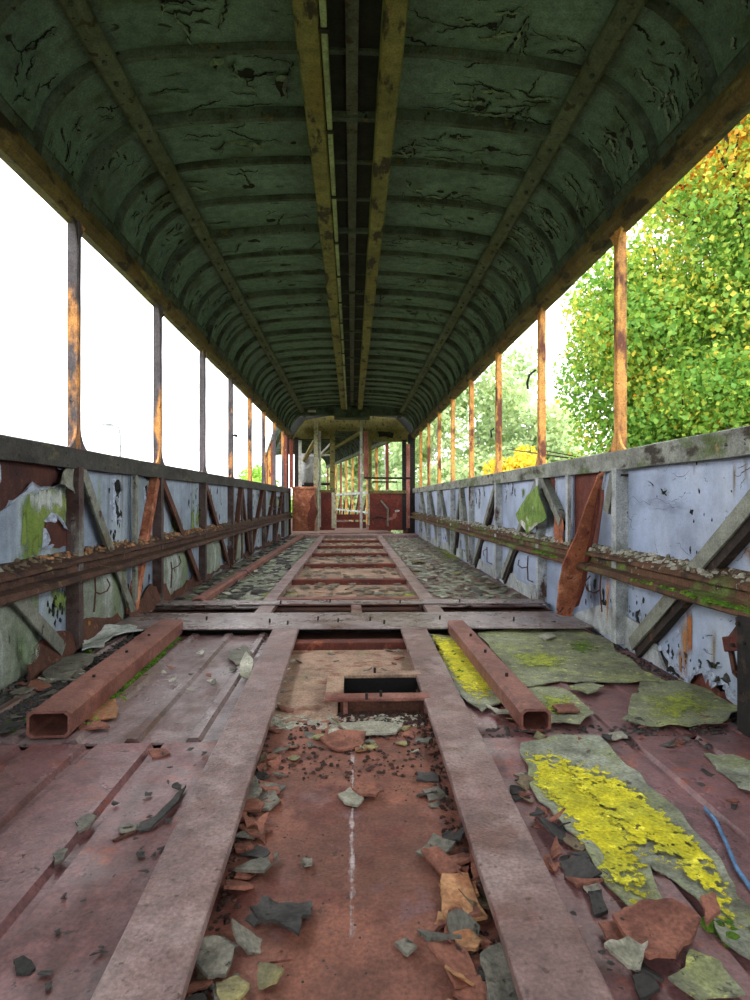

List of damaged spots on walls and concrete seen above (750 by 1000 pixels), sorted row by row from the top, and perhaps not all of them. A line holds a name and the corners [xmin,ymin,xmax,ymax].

spalling [42,512,70,550]
rust [575,472,607,544]
peeling [658,629,737,705]
rust [224,751,287,891]